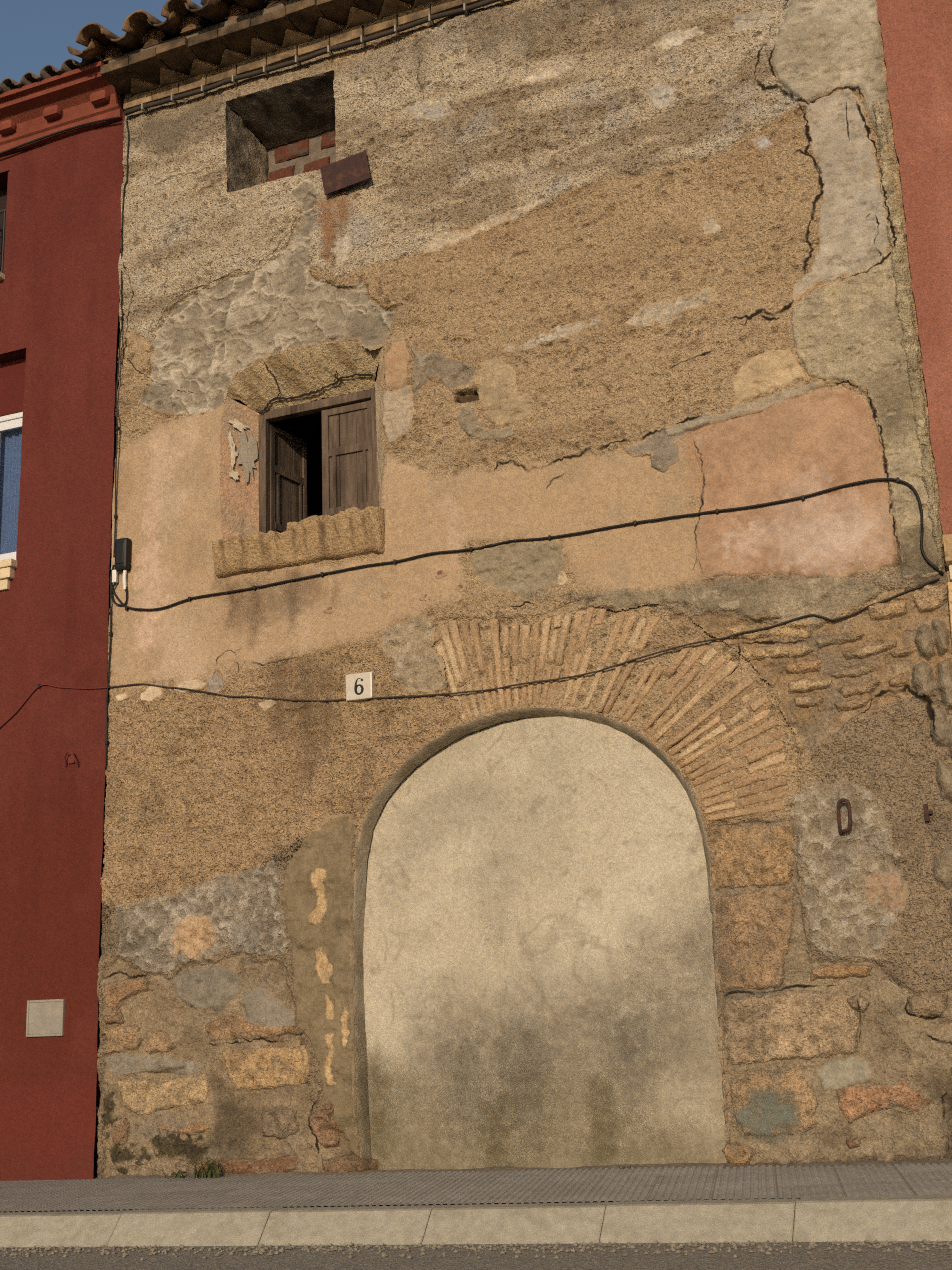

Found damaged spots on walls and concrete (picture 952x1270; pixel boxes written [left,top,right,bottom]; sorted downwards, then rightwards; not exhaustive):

peeling [751,135,774,153]
crack [754,48,897,275]
peeling [419,198,545,256]
peeling [701,216,721,235]
flaking render [138,201,410,416]
peeling [501,286,718,354]
crack [733,301,793,325]
spalling [452,389,480,404]
peeling [228,418,258,484]
crack [494,416,705,570]
flaking render [99,860,379,1178]